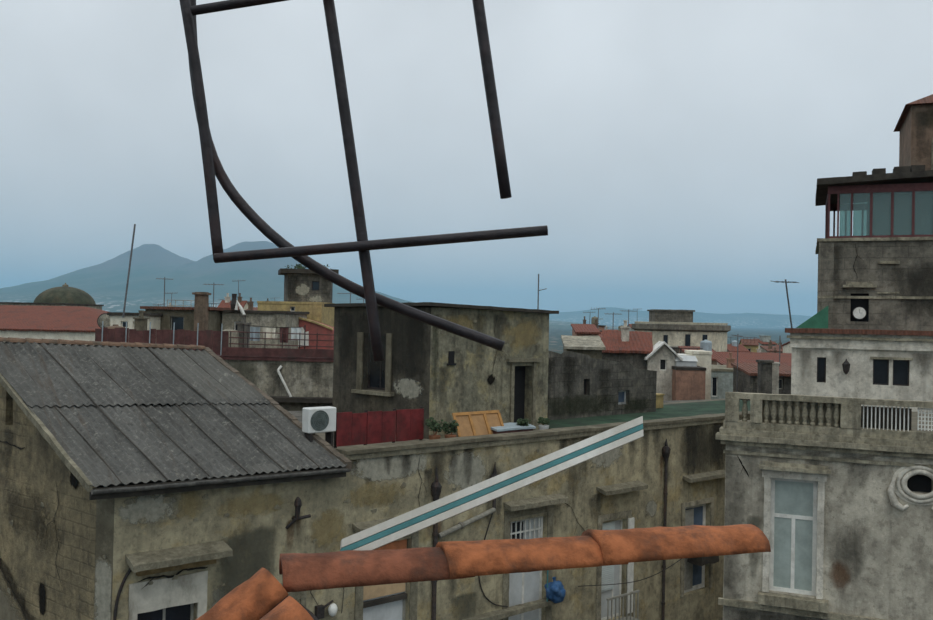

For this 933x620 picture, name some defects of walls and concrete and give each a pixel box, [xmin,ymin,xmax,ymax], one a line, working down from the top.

peeling [394,379,422,398]